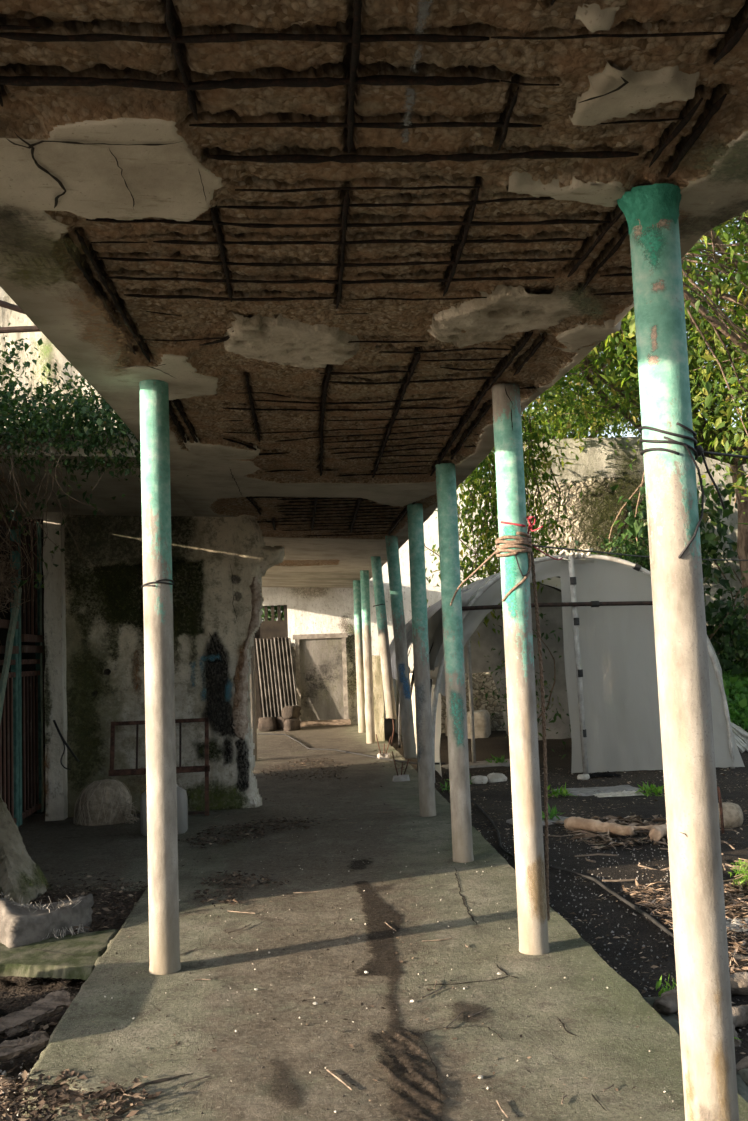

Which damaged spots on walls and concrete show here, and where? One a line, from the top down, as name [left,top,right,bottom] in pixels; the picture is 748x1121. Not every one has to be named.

crack [579,77,629,103]
crack [6,133,182,208]
spalling [0,0,748,539]
damp [64,515,144,790]
damp [171,516,205,669]
flaking render [232,577,262,740]
flaking render [534,477,648,564]
damp [194,740,224,761]